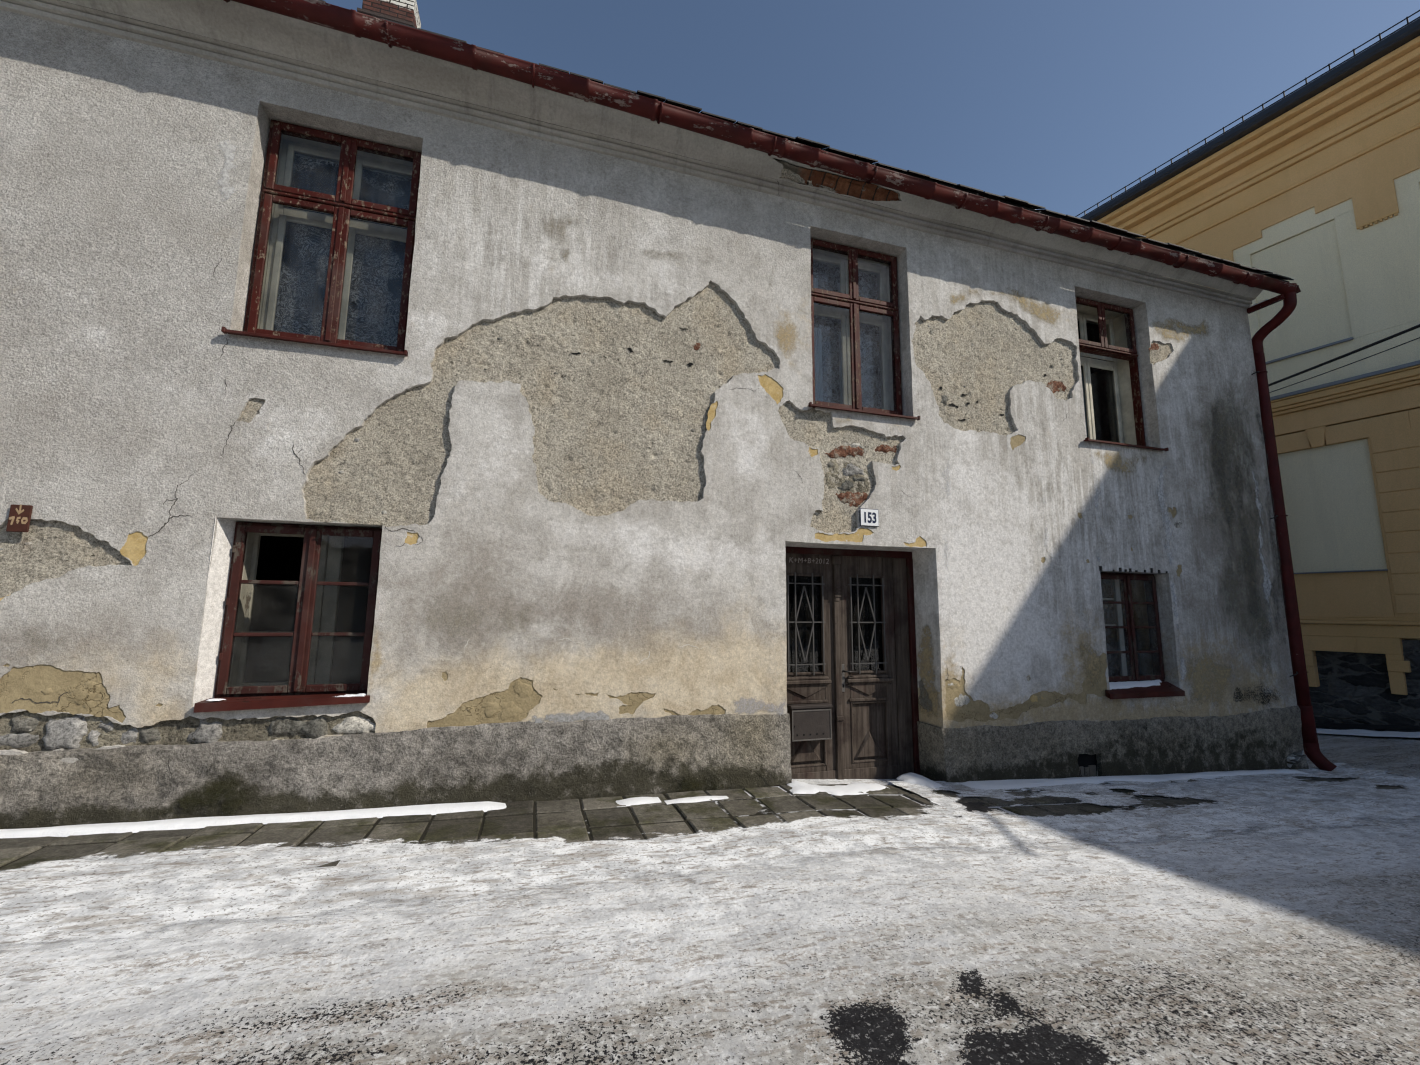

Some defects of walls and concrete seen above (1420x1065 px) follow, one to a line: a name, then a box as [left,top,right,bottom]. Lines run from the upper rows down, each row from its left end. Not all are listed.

flaking render [303,282,904,545]
flaking render [911,302,1077,450]
flaking render [0,519,148,601]
water stain [1209,401,1281,662]
flaking render [0,663,376,753]
peeling [427,677,556,728]
peeling [576,692,726,715]
peeling [945,667,1087,722]